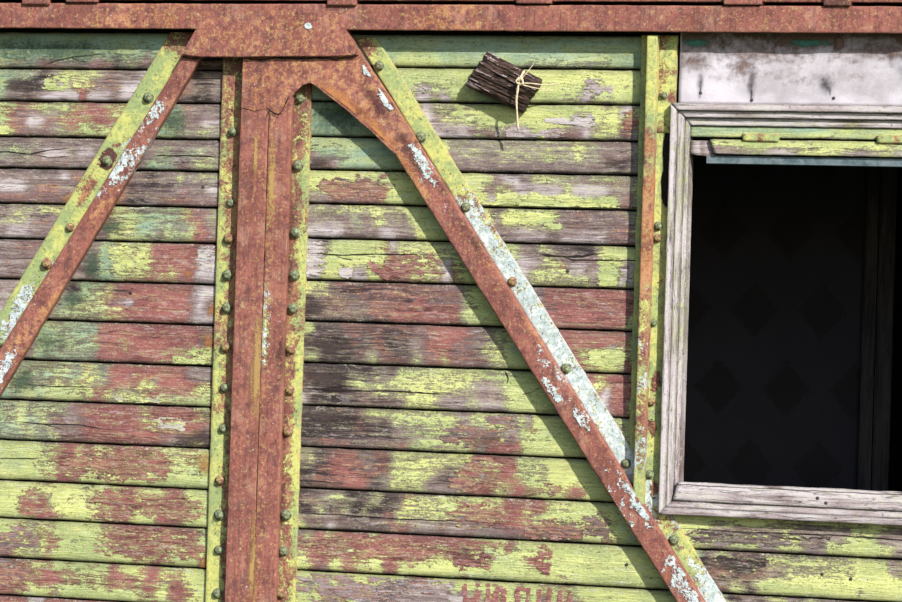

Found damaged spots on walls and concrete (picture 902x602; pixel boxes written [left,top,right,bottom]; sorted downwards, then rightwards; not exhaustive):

rust [318,84,408,147]
peeling [408,143,438,187]
peeling [477,198,620,230]
peeling [597,254,630,287]
peeling [0,343,18,383]
rust [250,319,263,415]
rust [651,370,661,395]
peeling [58,448,208,563]
peeling [524,468,653,575]
peeling [297,532,506,573]
peeling [660,551,701,602]
peeling [684,527,850,581]